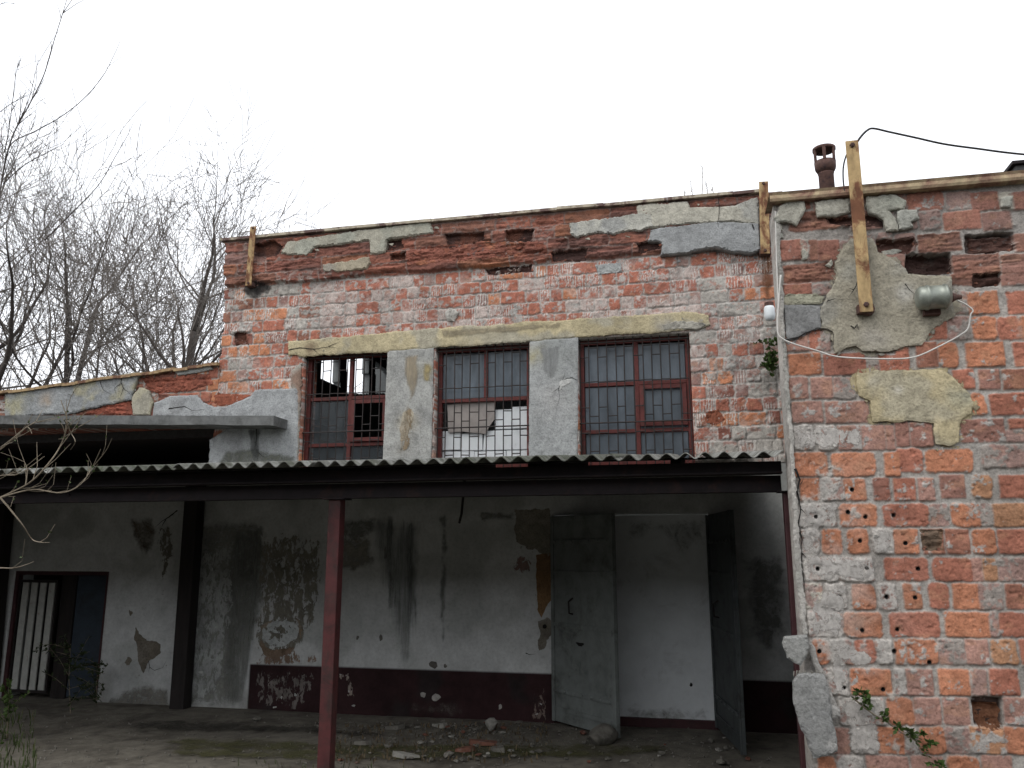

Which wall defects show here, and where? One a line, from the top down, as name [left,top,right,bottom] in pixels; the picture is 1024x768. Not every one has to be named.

spalling [388,226,590,275]
spalling [626,236,662,253]
spalling [967,236,1013,254]
spalling [972,271,1001,287]
peeling [514,508,550,556]
crack [794,468,807,588]
damp [343,519,413,634]
flaking render [193,524,322,709]
peeling [538,617,551,650]
peeling [125,628,167,689]
peeling [782,634,841,719]
spalling [971,702,1004,732]